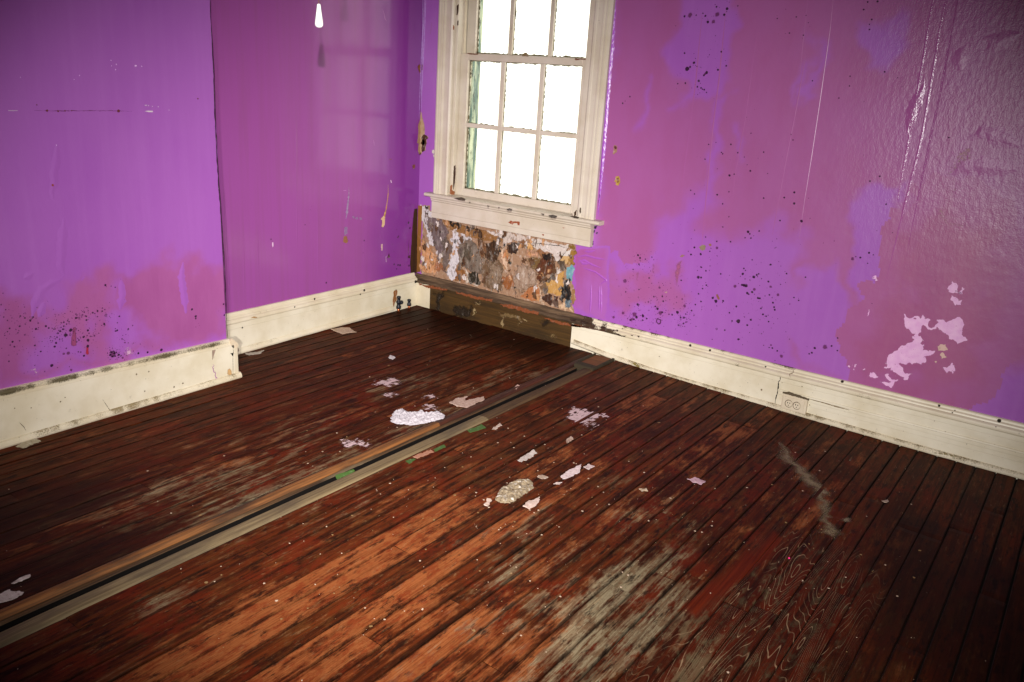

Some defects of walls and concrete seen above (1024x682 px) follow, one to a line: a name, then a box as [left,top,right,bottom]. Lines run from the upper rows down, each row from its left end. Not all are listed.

peeling [412,113,436,169]
water stain [0,229,226,389]
spalling [408,205,577,313]
water stain [592,0,1024,412]
peeling [848,281,967,388]